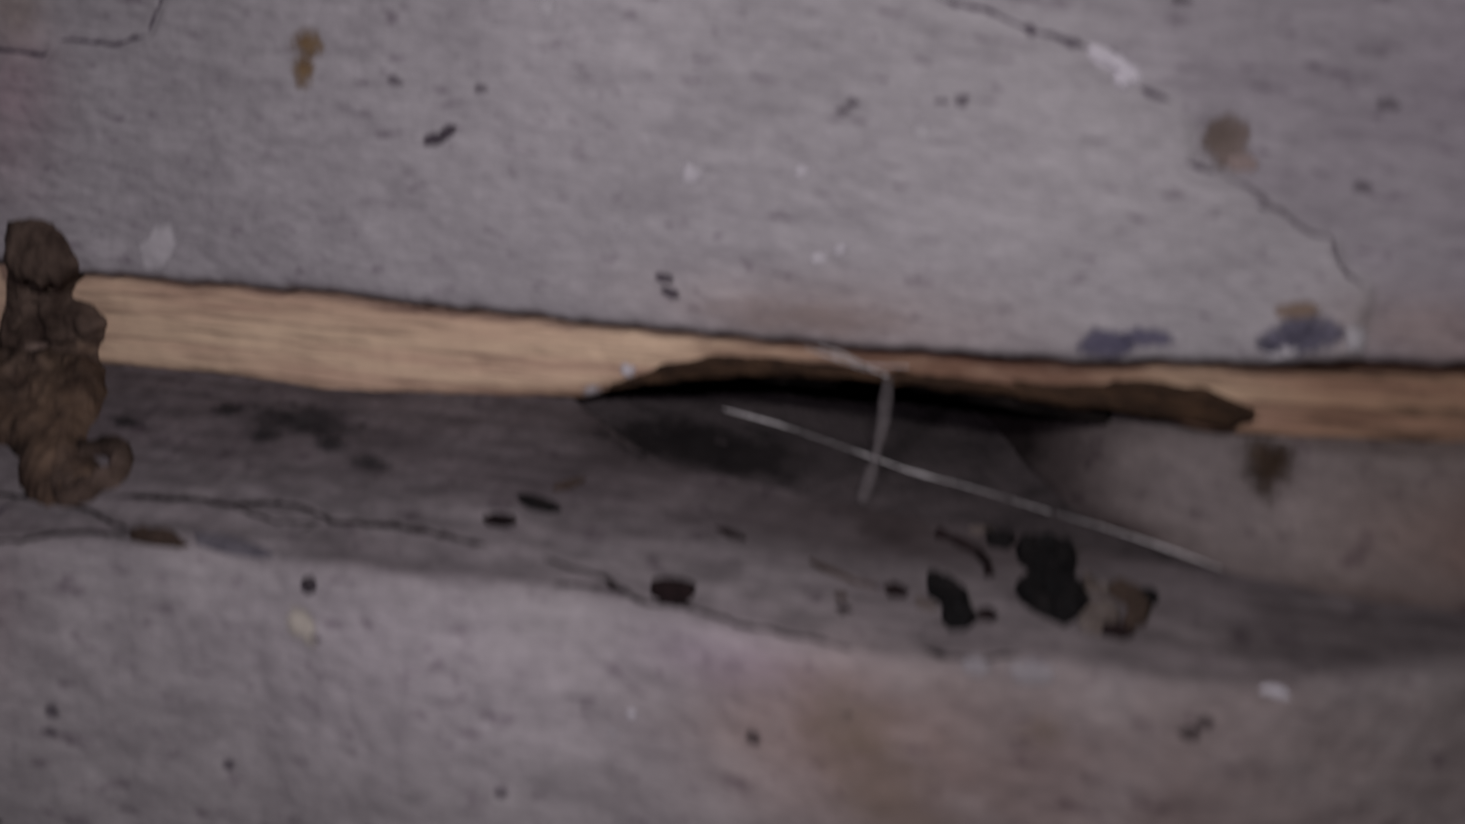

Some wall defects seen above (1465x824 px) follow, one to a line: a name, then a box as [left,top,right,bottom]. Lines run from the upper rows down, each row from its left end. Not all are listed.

crack [0,0,163,57]
rust [294,34,323,85]
spalling [138,223,177,270]
spalling [655,273,679,299]
spalling [1250,441,1289,493]
crack [0,493,488,545]